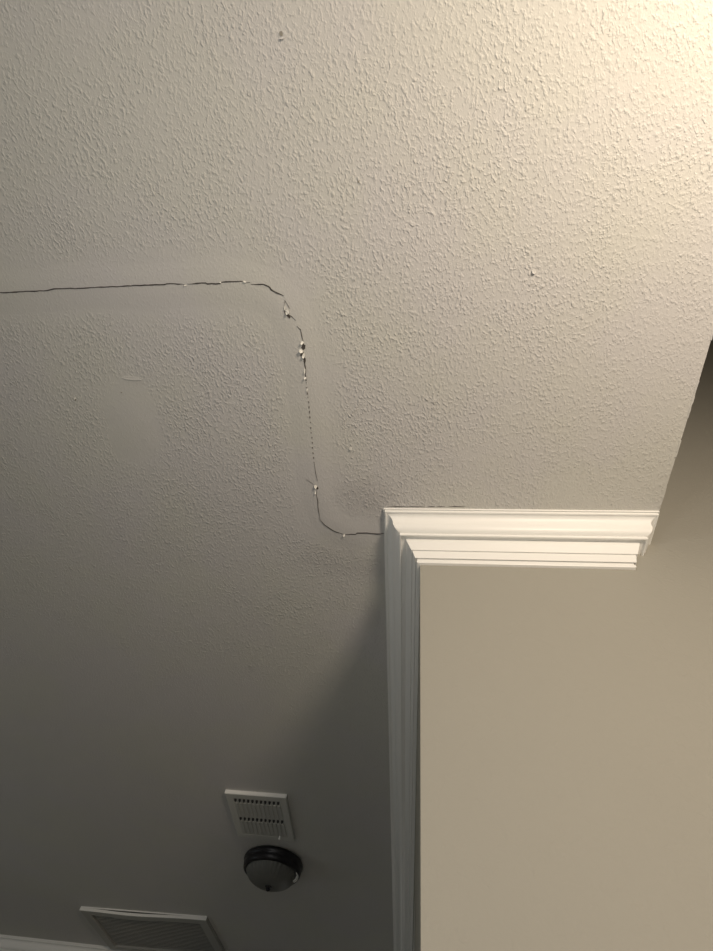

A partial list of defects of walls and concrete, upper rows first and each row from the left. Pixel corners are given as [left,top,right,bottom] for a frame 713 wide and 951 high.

crack [0,281,384,537]